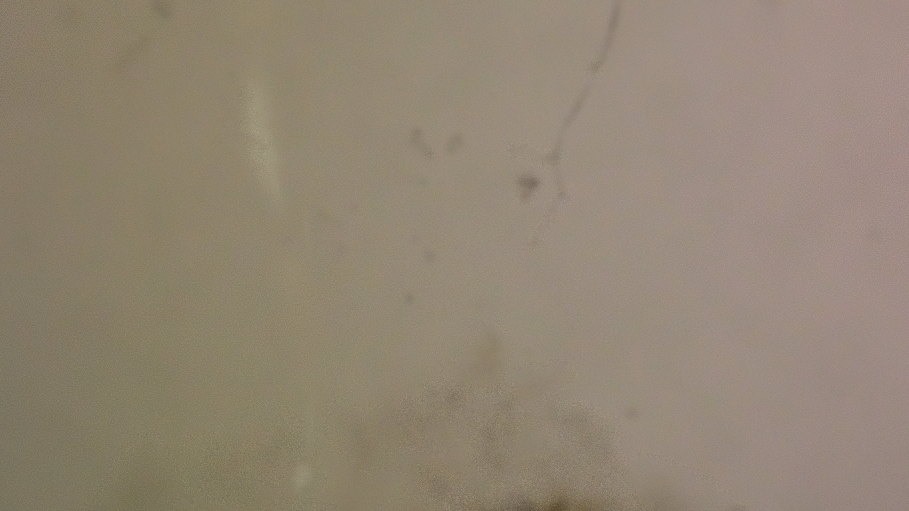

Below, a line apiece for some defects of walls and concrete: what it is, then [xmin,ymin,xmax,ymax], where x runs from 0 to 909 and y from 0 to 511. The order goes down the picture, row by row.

crack [551,0,625,201]
leakage [303,311,711,511]